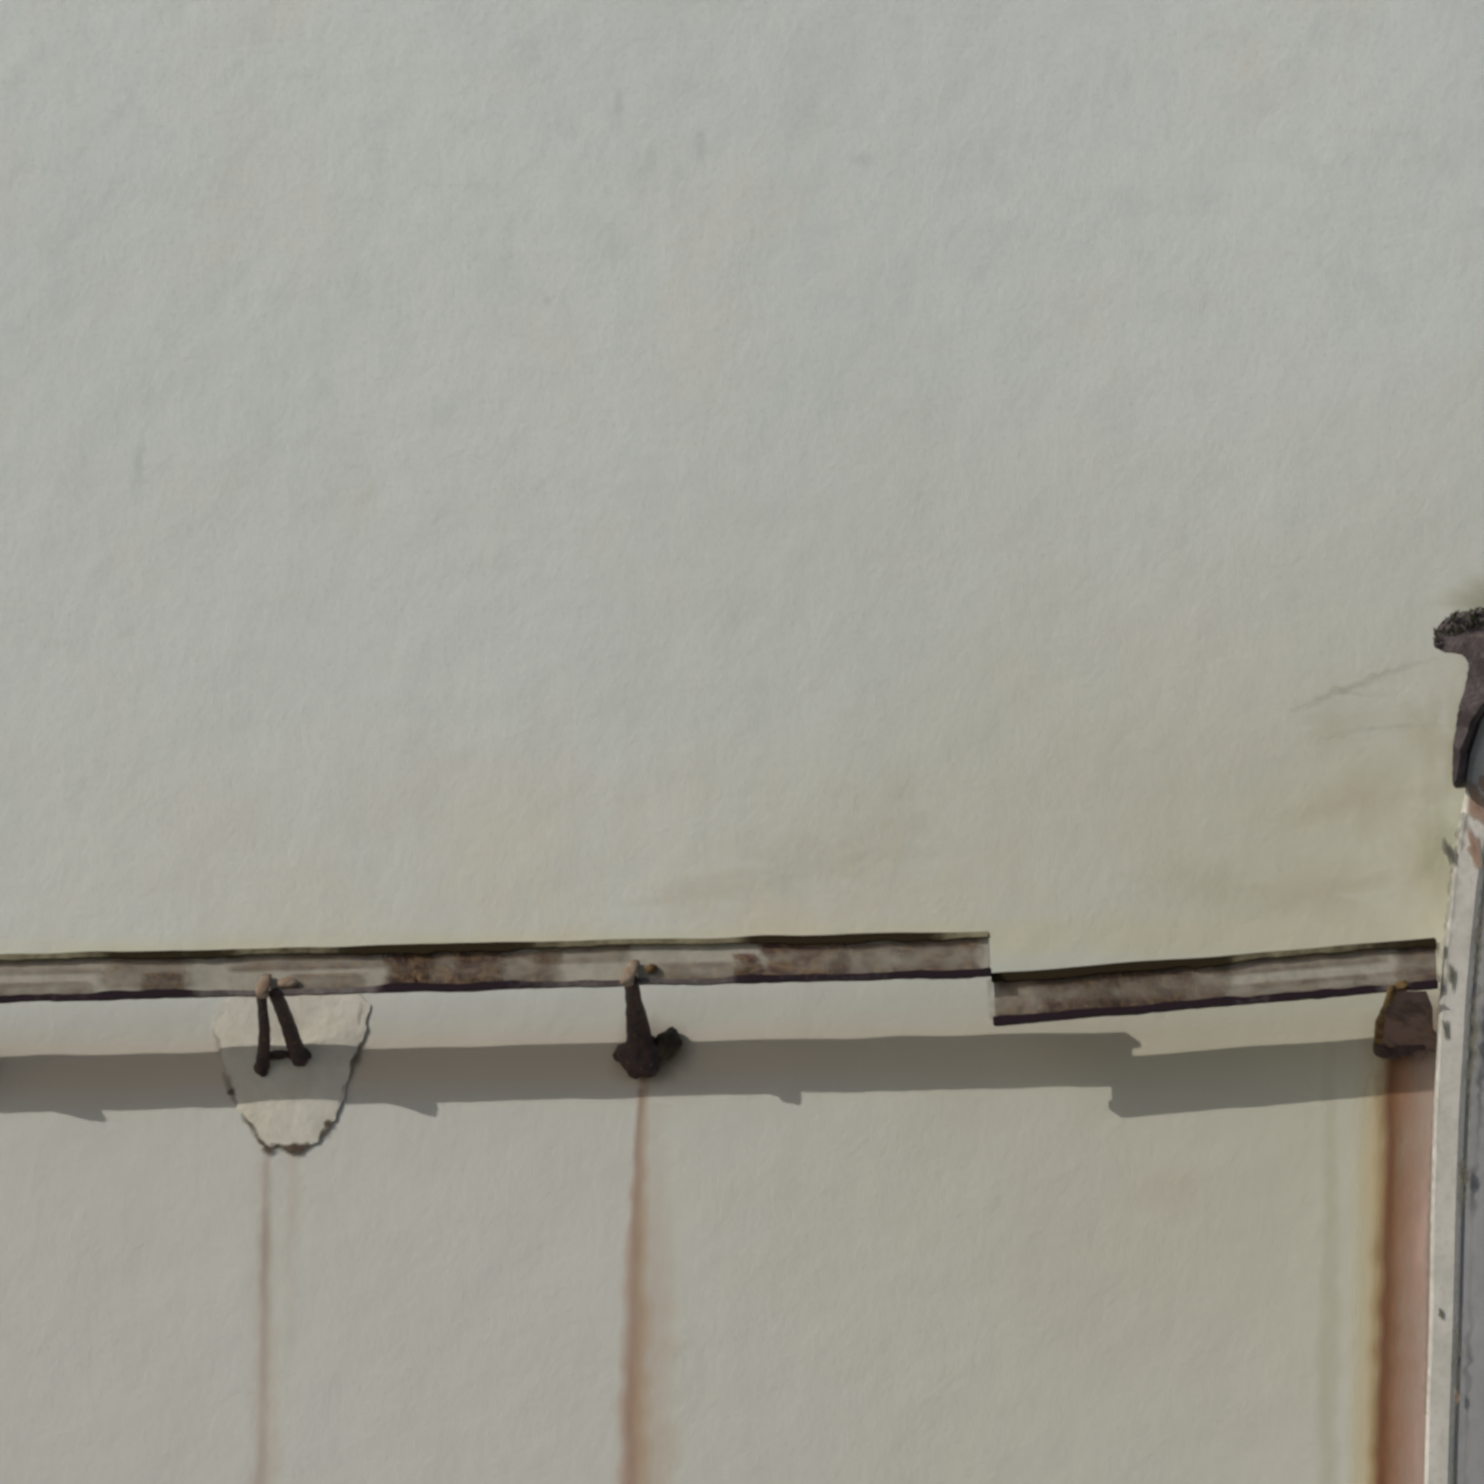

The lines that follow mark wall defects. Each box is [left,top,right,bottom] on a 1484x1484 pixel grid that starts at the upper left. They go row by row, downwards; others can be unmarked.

rust [1357,1015,1438,1484]